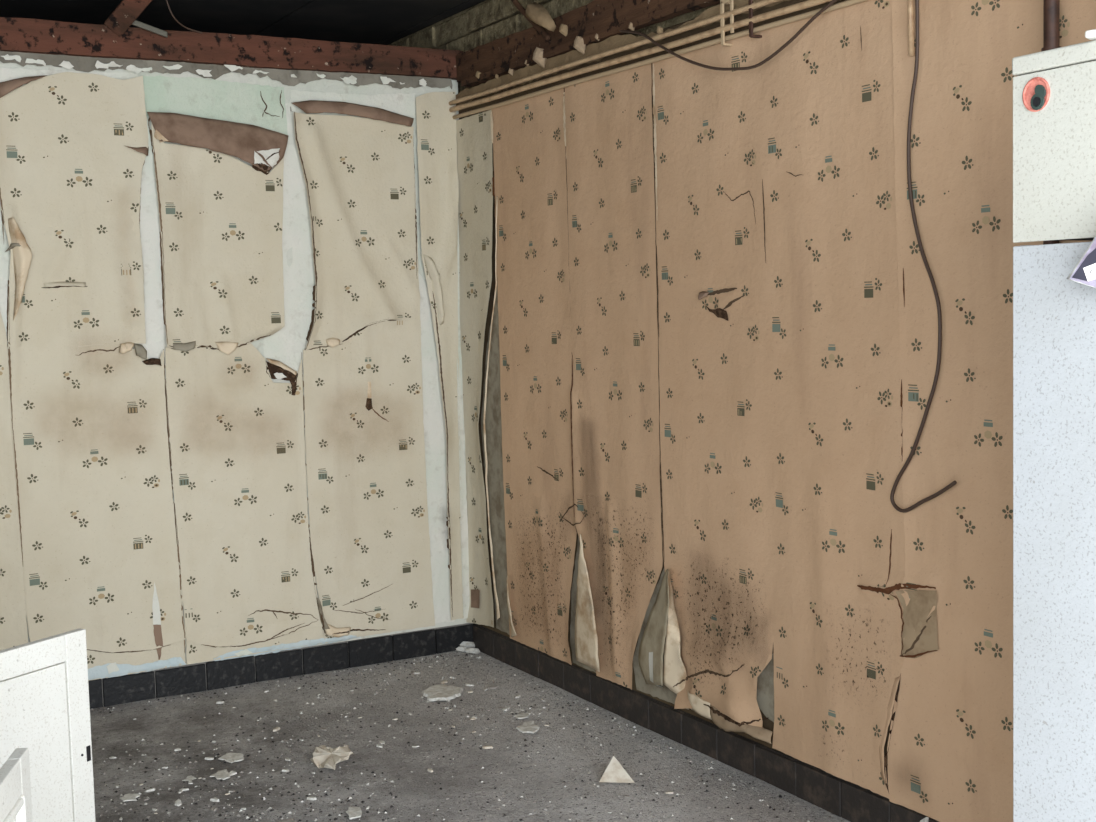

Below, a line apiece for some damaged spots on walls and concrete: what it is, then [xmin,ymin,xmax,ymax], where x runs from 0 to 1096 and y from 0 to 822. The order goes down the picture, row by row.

crack [87,91,392,663]
flaking render [0,0,790,379]
damp [688,575,757,683]